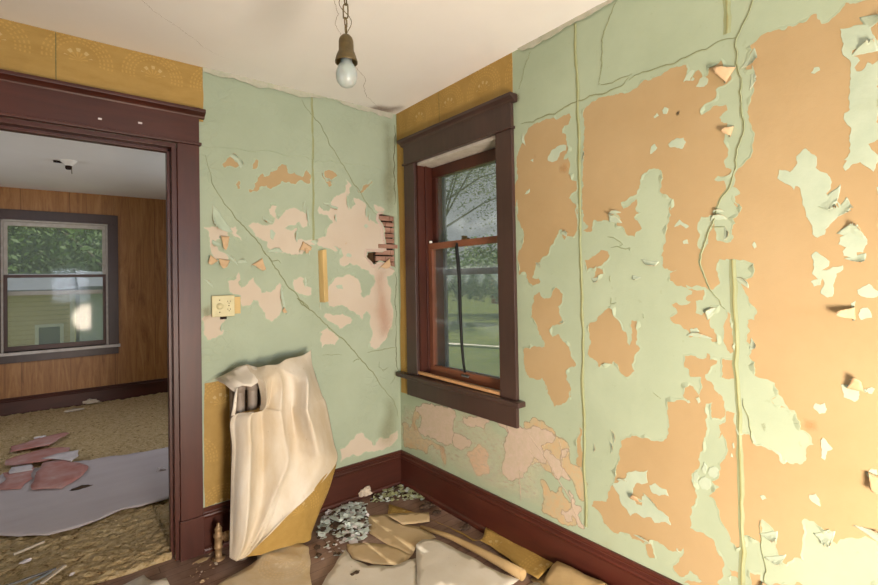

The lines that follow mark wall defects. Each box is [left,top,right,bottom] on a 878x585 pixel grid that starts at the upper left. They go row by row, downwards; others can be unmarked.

peeling [201,154,398,350]
crack [205,155,399,415]
crack [302,101,396,215]
peeling [339,0,878,585]
crack [522,0,753,309]
crack [743,402,753,443]
crack [759,524,767,583]